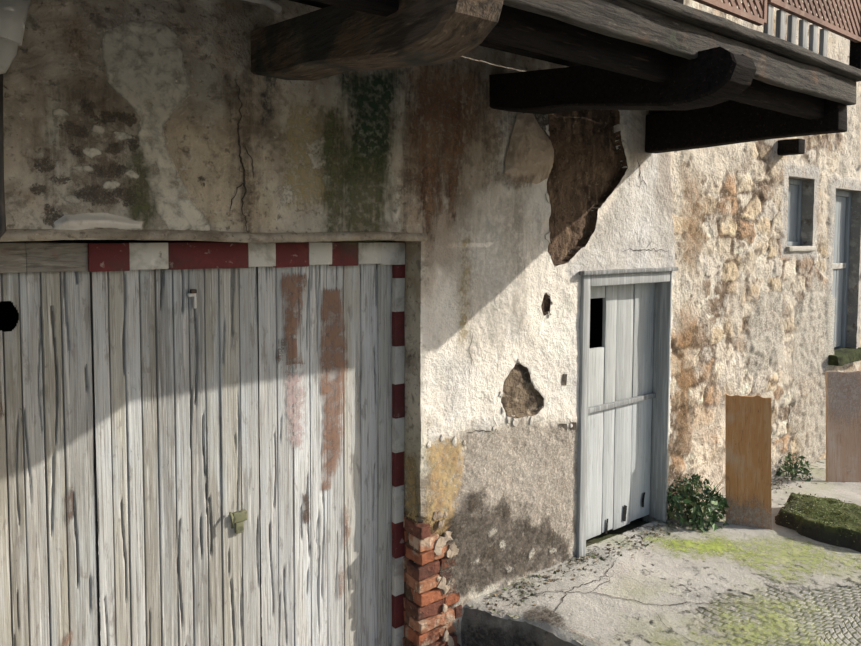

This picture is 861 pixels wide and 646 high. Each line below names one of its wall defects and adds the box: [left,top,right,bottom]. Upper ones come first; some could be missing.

crack [230,80,254,233]
damp [284,70,397,241]
spalling [523,109,628,267]
peeling [402,359,576,646]
damp [440,491,572,596]
crack [506,556,763,646]